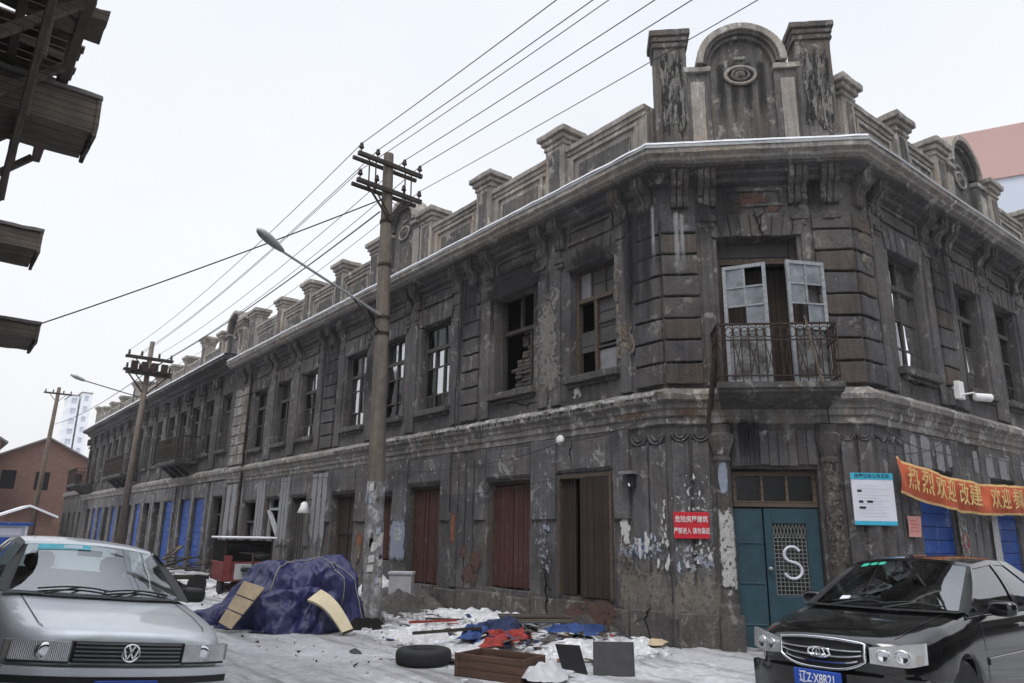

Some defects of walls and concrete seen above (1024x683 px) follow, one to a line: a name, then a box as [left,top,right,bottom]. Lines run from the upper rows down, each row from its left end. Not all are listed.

peeling [366,528,384,587]
flaking render [564,447,739,629]
crack [543,568,552,614]